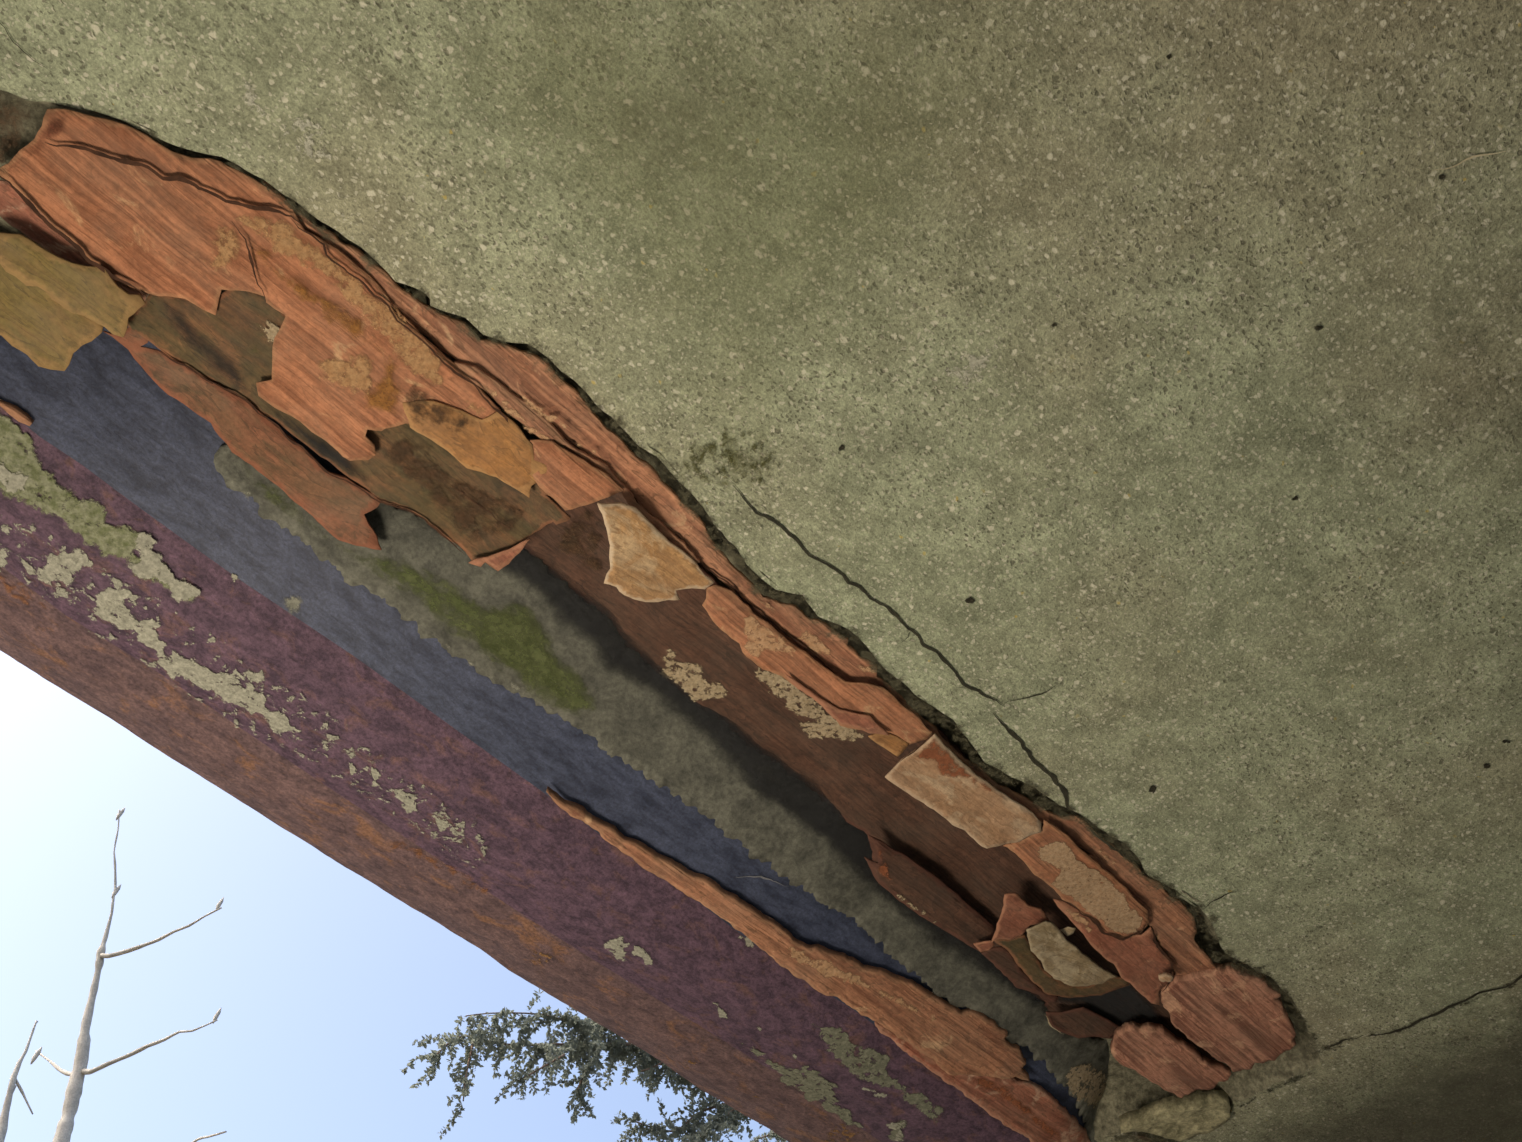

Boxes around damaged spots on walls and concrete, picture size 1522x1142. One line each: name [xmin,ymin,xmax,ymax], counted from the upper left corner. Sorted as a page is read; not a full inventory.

spalling [0,90,383,268]
spalling [396,282,1321,1141]
crack [713,465,1077,817]
crack [1322,975,1522,1052]